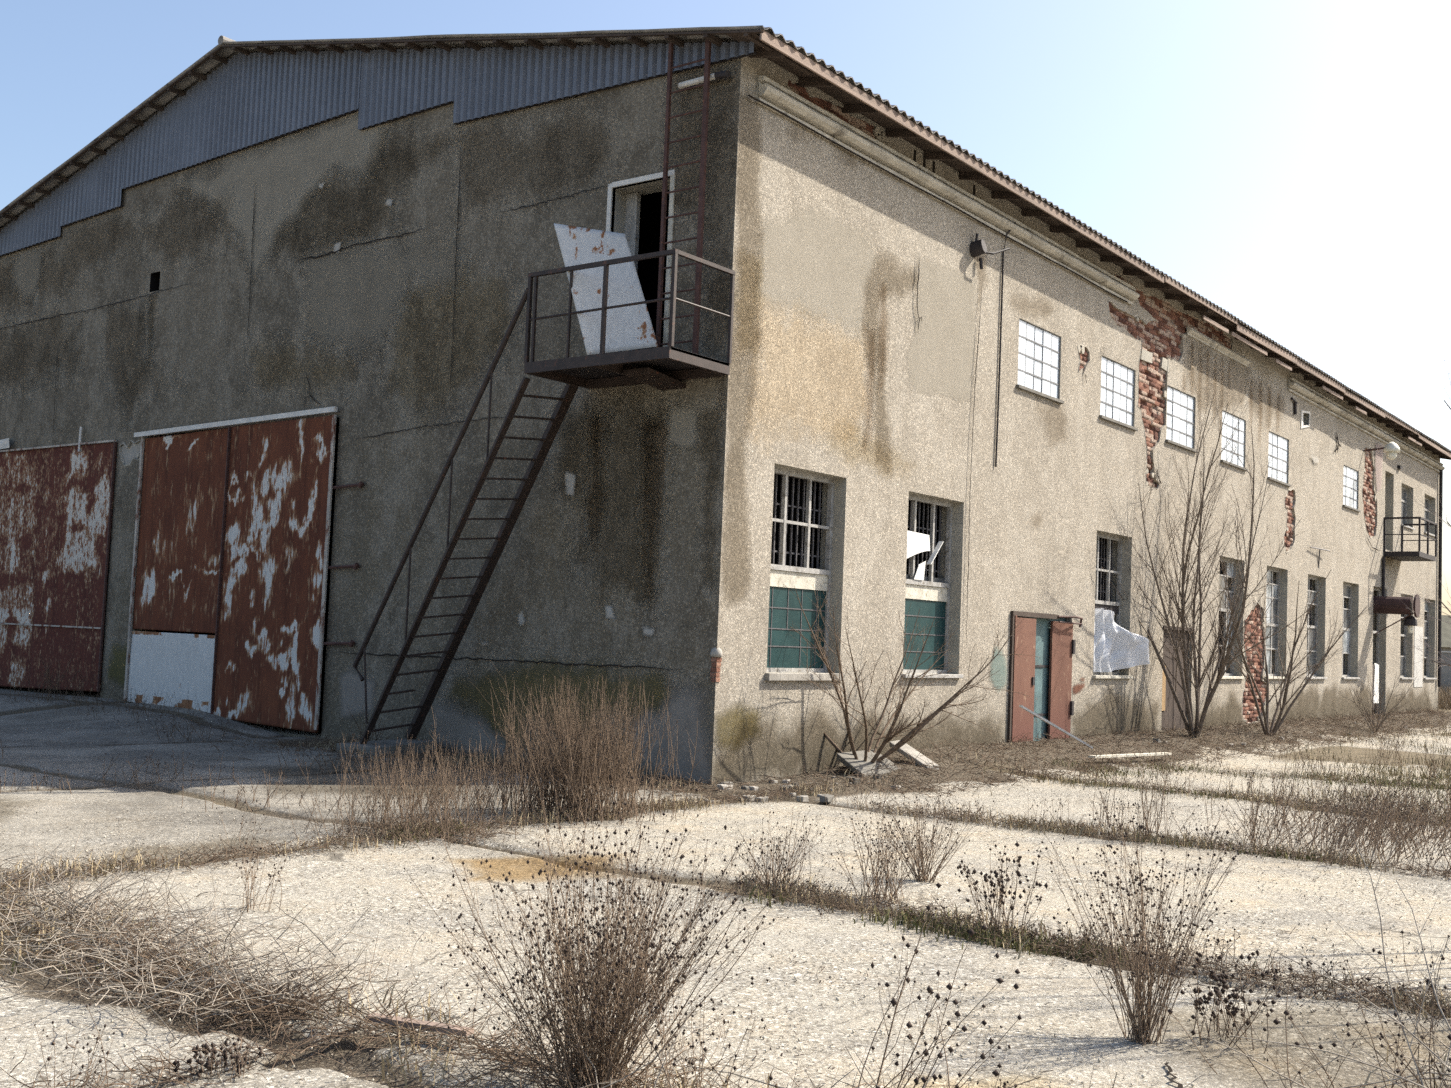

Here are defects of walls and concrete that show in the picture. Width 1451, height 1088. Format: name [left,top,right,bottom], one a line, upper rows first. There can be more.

flaking render [1108,273,1233,489]
flaking render [1362,447,1377,539]
flaking render [1242,601,1266,724]